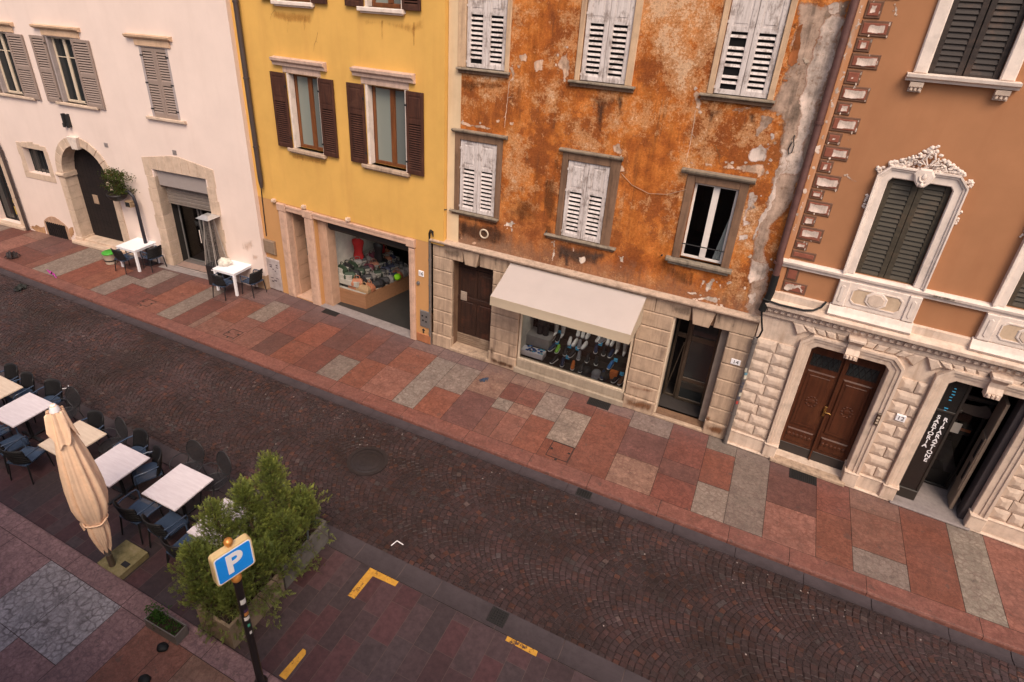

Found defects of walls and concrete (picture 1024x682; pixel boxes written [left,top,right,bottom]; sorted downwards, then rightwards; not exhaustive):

flaking render [509,46,570,82]
flaking render [687,0,897,316]